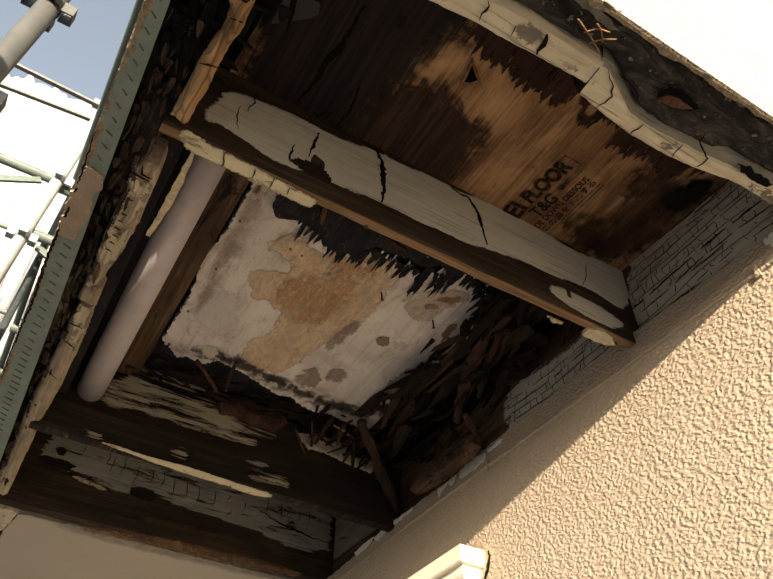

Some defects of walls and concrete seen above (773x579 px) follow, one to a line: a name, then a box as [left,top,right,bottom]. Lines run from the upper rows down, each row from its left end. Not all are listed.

crack [536,34,548,55]
peeling [98,166,153,265]
peeling [178,130,317,208]
crack [375,149,387,203]
crack [451,187,488,245]
peeling [204,91,773,329]
leakage [563,169,720,262]
crack [628,182,773,327]
leakage [191,234,410,418]
leakage [403,290,469,322]
peeling [102,367,277,446]
peeling [38,429,386,562]